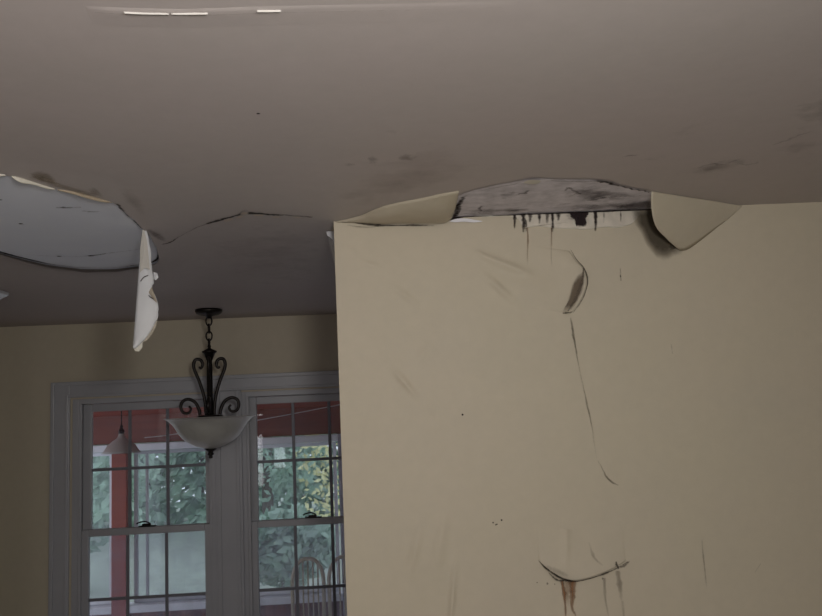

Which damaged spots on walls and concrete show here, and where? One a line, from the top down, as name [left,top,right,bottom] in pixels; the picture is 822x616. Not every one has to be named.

crack [207,212,300,224]
peeling [335,191,494,226]
leakage [450,197,676,254]
peeling [511,211,639,230]
peeling [651,191,741,251]